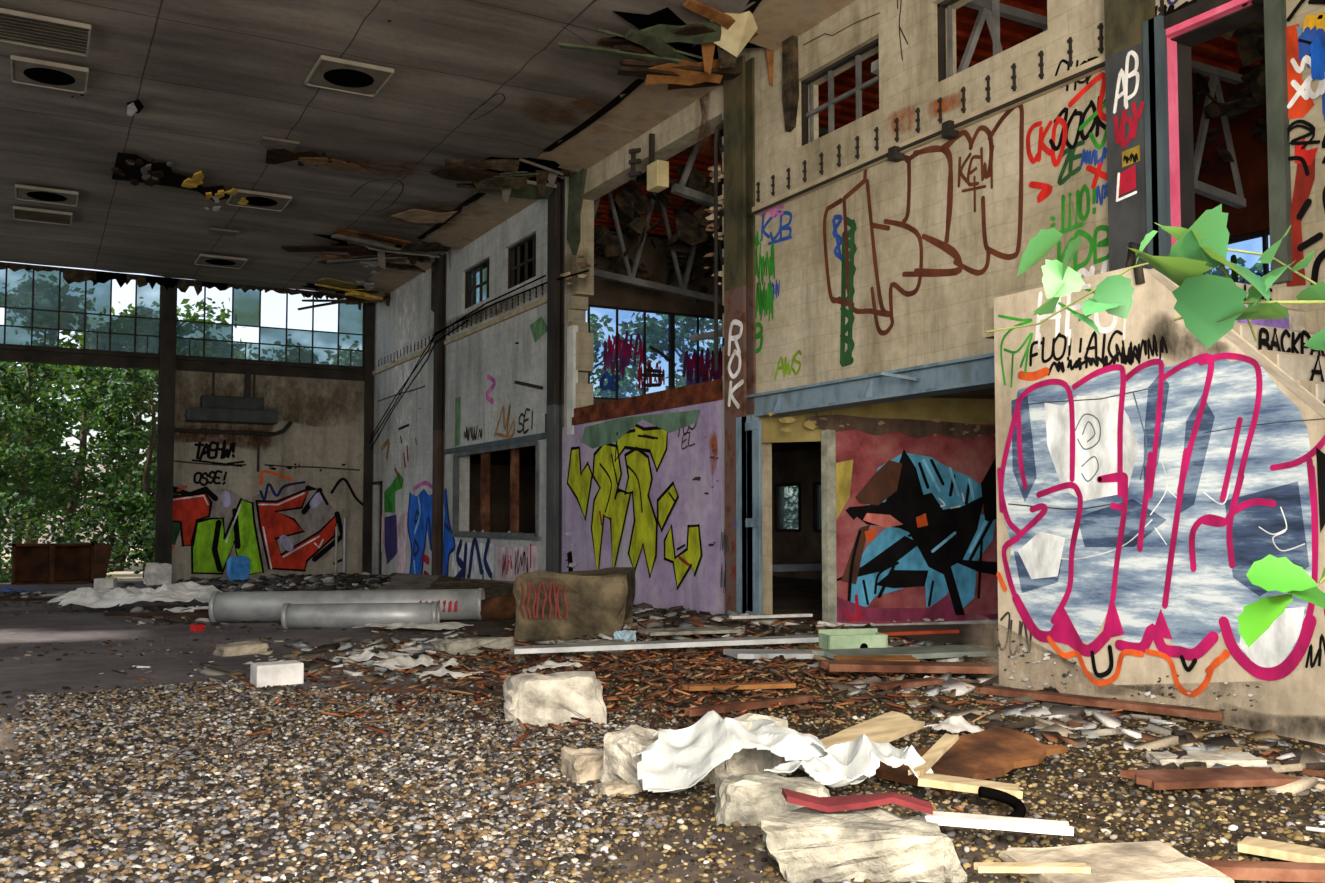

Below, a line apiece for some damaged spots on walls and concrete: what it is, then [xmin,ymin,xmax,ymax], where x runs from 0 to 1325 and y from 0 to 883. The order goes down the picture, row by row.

peeling [710,11,758,57]
peeling [182,171,248,211]
peeling [392,205,457,228]